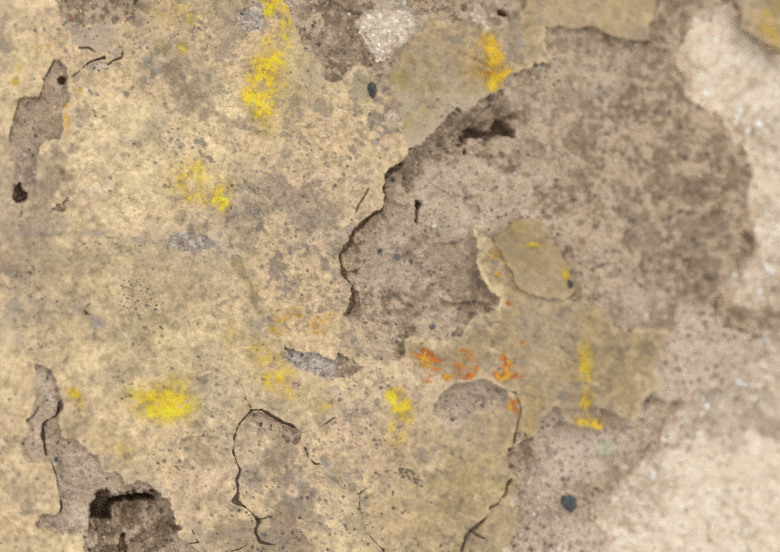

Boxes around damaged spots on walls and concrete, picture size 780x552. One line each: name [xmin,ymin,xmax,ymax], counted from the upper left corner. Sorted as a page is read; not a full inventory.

spalling [54,0,139,32]
spalling [237,1,265,33]
spalling [9,59,70,205]
spalling [167,232,216,254]
spalling [283,0,780,552]
spalling [268,346,365,395]
spalling [21,364,208,552]
crack [231,389,296,552]
crack [460,478,513,552]